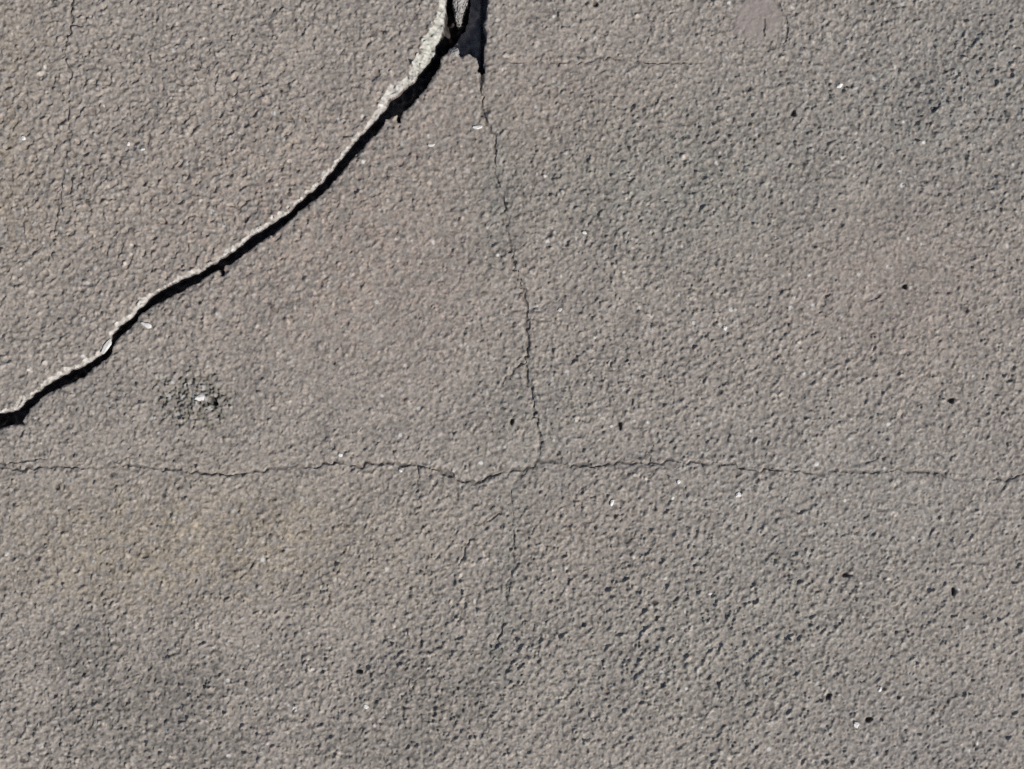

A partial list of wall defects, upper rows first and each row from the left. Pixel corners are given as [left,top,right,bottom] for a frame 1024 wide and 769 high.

crack [46,0,82,264]
crack [508,53,705,65]
crack [762,0,789,44]
crack [0,59,1024,664]